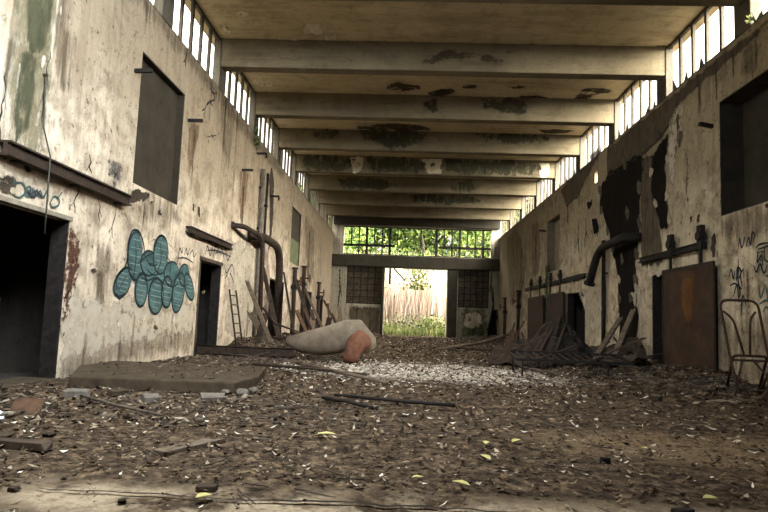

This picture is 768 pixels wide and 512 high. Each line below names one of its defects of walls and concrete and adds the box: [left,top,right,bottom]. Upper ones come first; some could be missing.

damp [2,0,62,154]
peeling [387,82,477,113]
peeling [481,85,547,115]
peeling [303,123,550,206]
flaking render [586,104,684,340]